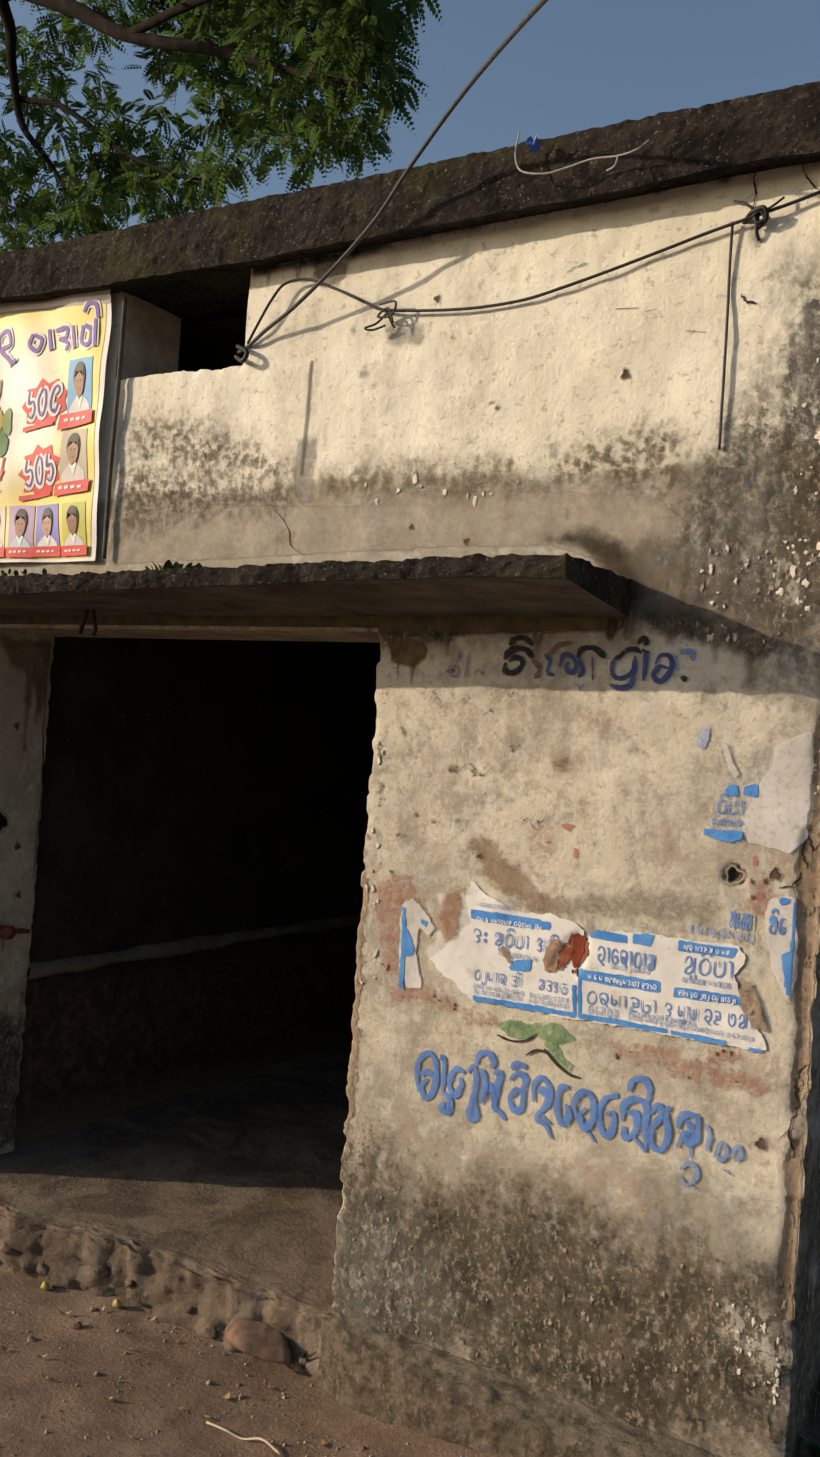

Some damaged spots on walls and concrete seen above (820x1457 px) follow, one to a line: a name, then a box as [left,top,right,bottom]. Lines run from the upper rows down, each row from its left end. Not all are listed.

water stain [252,244,386,286]
water stain [0,273,820,749]
crack [779,1065,807,1151]
water stain [335,1151,820,1449]